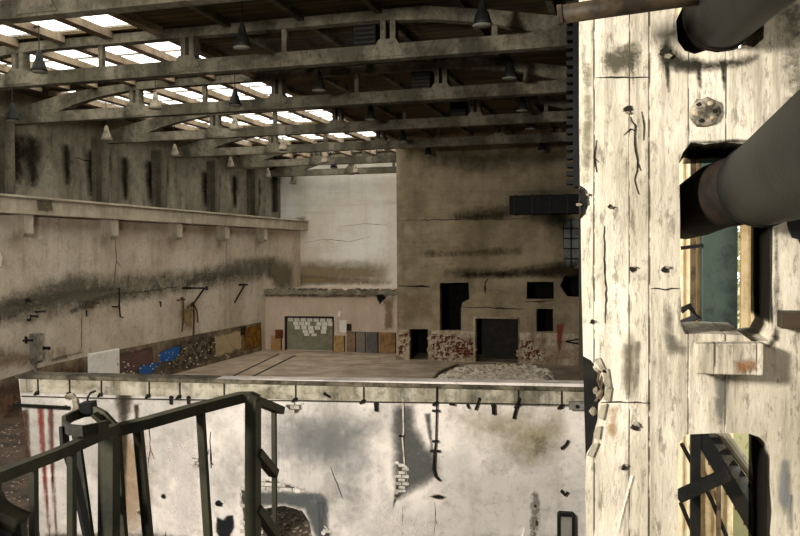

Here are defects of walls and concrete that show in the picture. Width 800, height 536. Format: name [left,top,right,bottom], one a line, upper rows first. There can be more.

damp [15,138,41,186]
damp [63,145,71,183]
crack [624,111,644,194]
damp [0,258,383,320]
damp [465,267,578,278]
corrosion [737,361,756,371]
spalling [583,356,612,457]